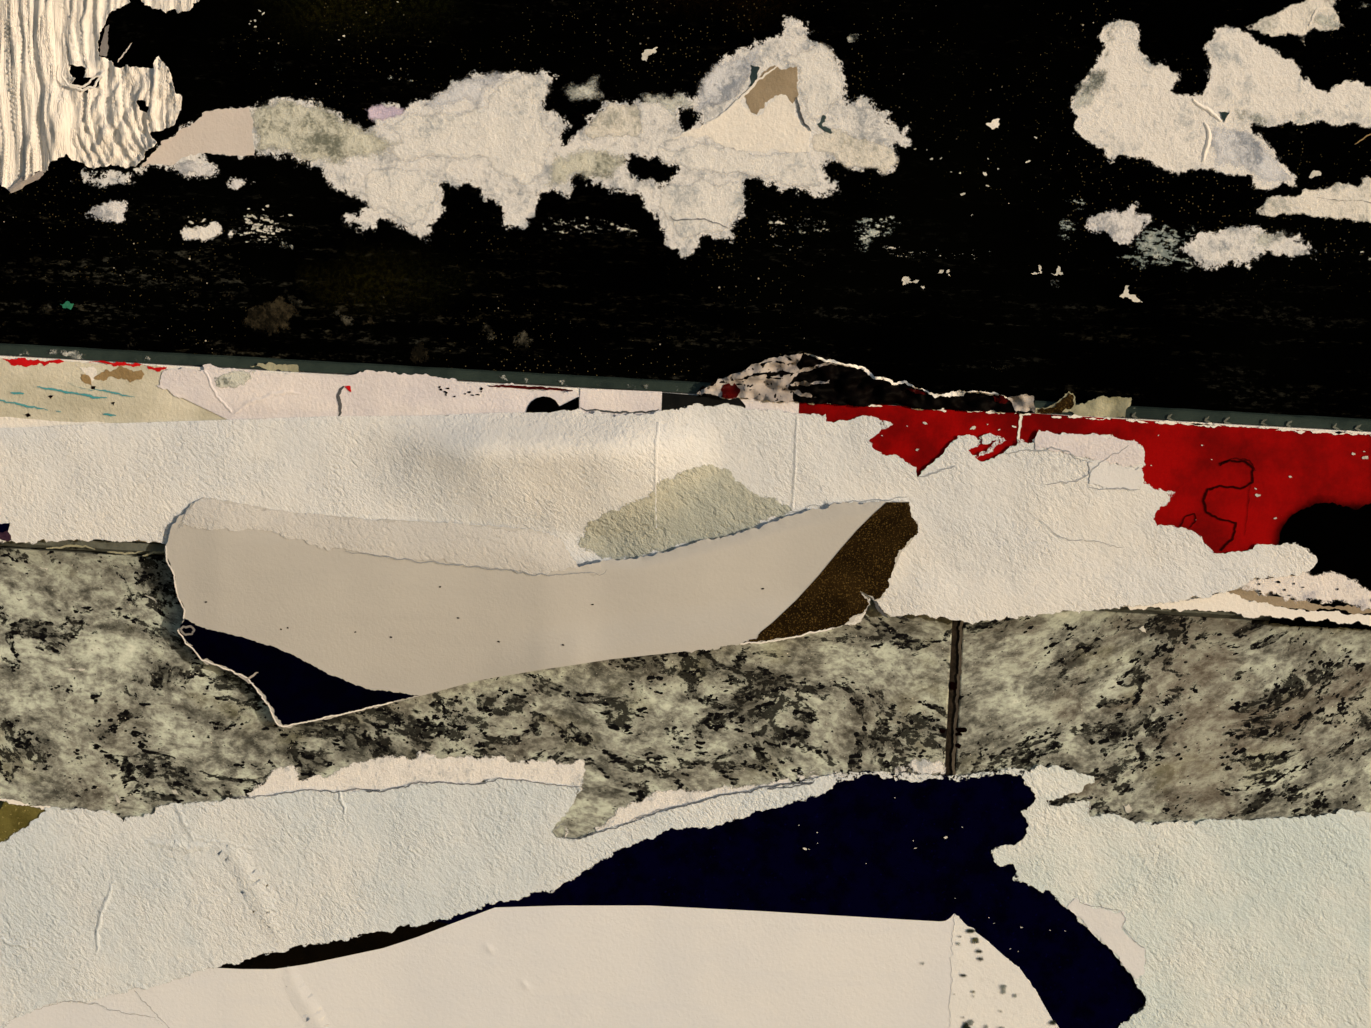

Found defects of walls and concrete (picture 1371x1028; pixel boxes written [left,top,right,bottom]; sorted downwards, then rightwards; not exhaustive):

peeling [748,65,760,87]
peeling [239,205,293,243]
peeling [855,216,950,276]
peeling [1122,221,1194,269]
spalling [1052,414,1367,435]